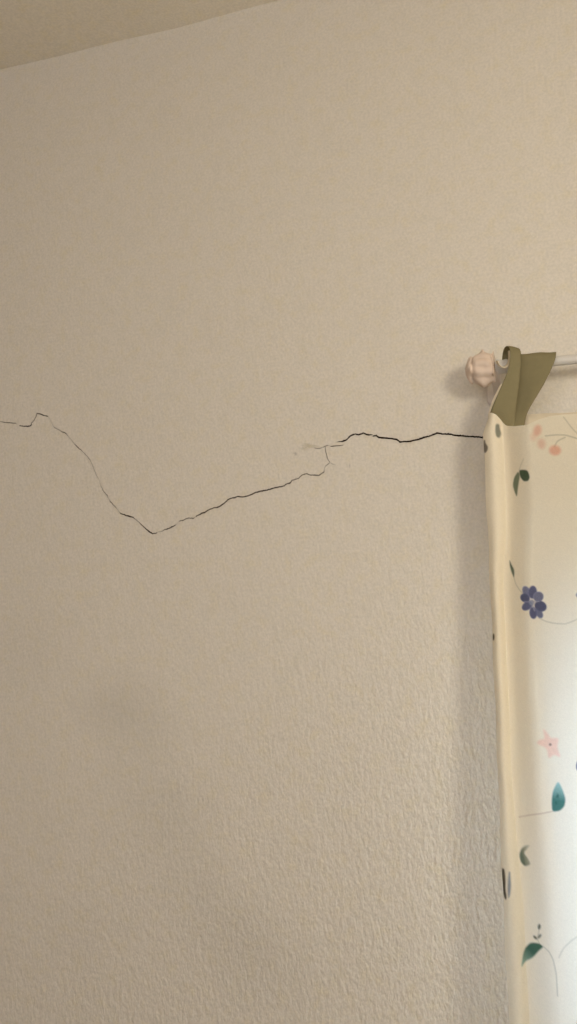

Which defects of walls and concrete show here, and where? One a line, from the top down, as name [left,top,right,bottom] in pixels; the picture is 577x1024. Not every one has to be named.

crack [4,413,82,451]
crack [104,432,483,535]